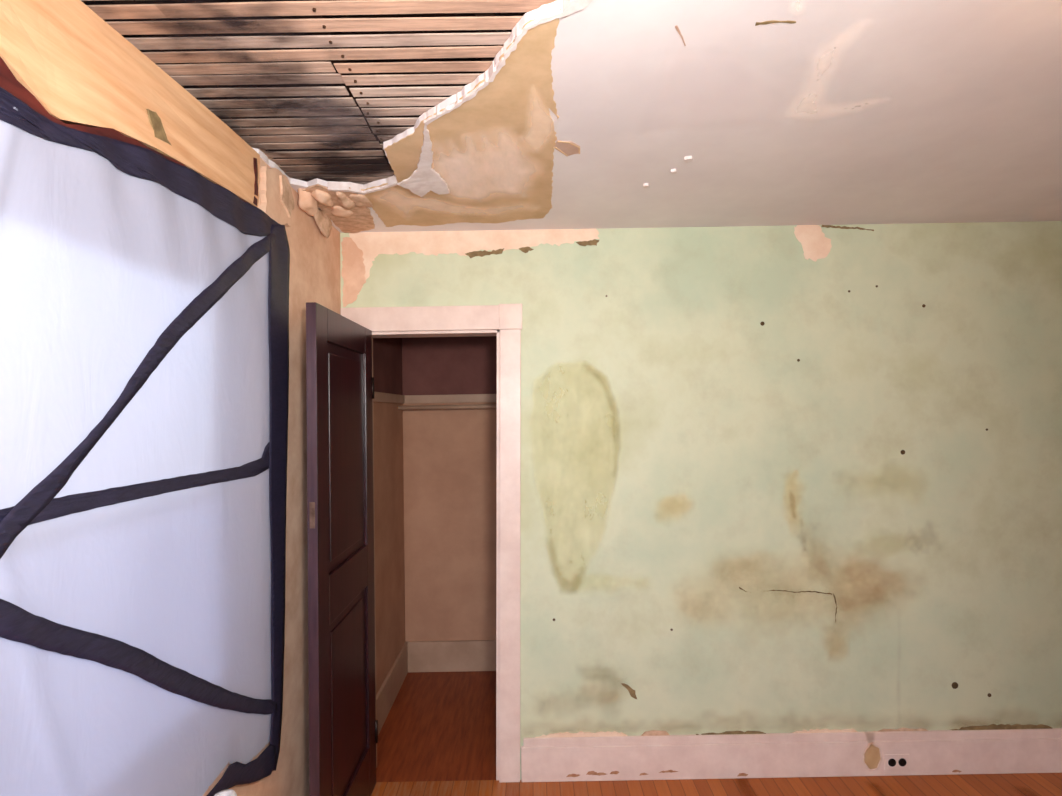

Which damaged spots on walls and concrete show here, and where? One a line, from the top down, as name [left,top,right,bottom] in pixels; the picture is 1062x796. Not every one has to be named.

water stain [161,16,393,182]
peeling [298,0,600,307]
peeling [794,225,874,262]